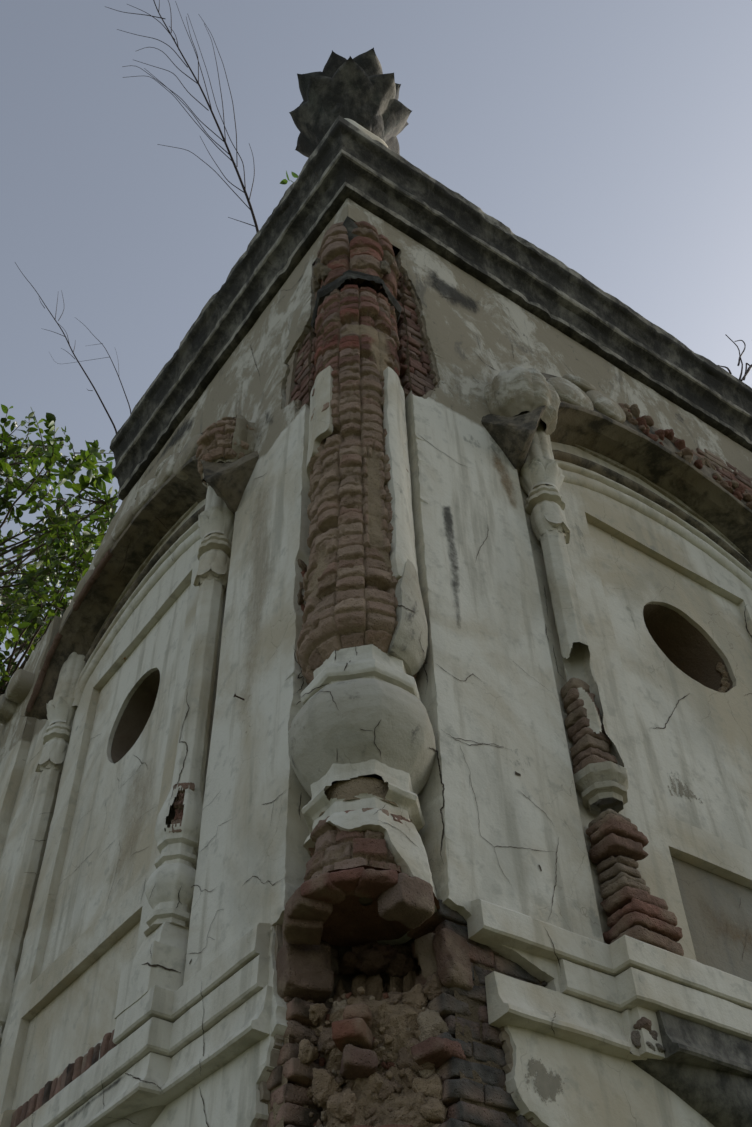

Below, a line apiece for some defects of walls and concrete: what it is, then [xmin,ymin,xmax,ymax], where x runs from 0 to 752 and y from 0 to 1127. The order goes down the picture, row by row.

flaking render [196,417,254,484]
flaking render [291,221,435,685]
spalling [618,403,752,510]
flaking render [168,782,195,833]
peeling [668,774,703,804]
crack [68,680,224,1127]
spalling [261,776,547,1127]
flaking render [10,1029,117,1127]
peeling [525,1059,562,1102]